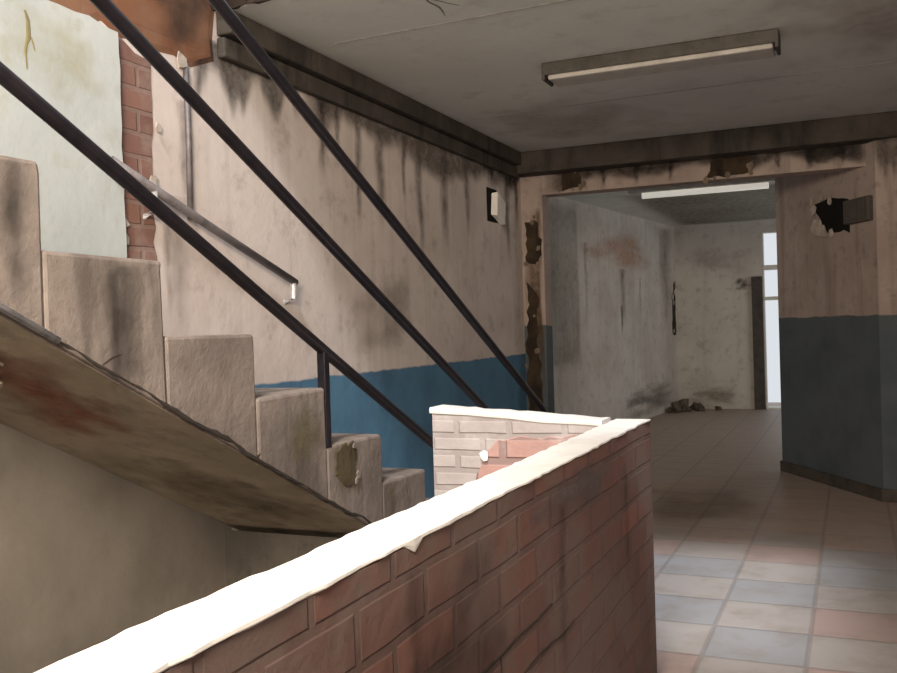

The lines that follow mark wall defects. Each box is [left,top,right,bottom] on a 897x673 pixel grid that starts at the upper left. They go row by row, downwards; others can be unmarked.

crack [426,0,459,16]
damp [315,97,517,212]
flaking render [703,156,754,184]
spalling [810,194,850,238]
flaking render [524,215,542,266]
flaking render [525,283,543,412]
spalling [335,440,361,487]